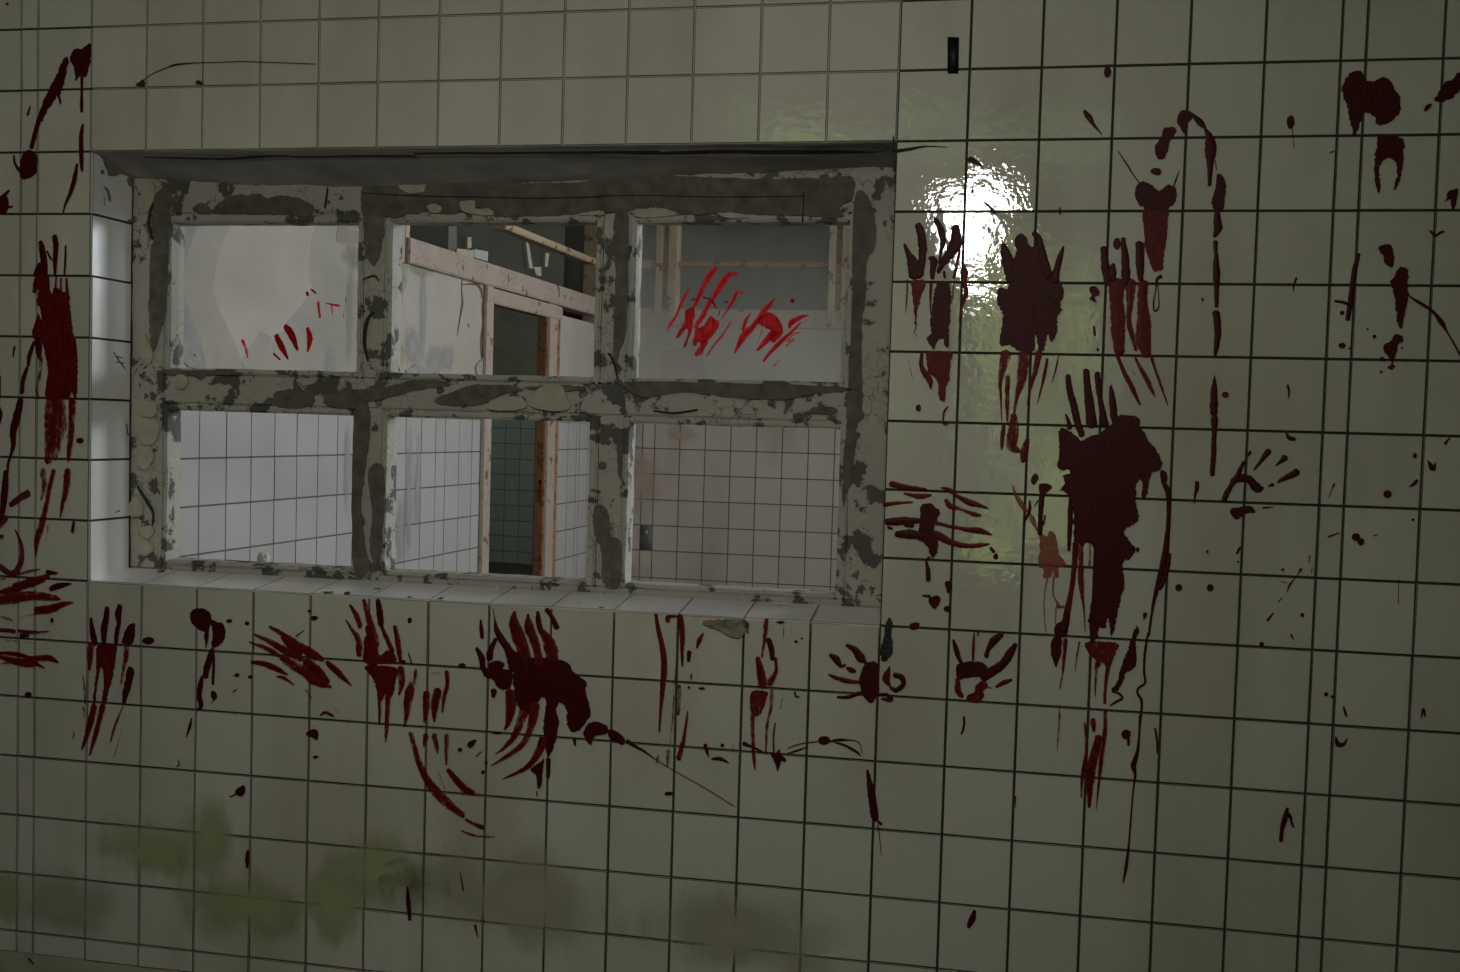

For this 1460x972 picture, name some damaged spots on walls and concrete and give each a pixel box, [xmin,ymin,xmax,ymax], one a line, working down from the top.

peeling [93,151,329,389]
peeling [336,175,877,508]
peeling [129,401,160,556]
peeling [273,345,586,594]
peeling [591,489,653,588]
leakage [377,653,853,972]